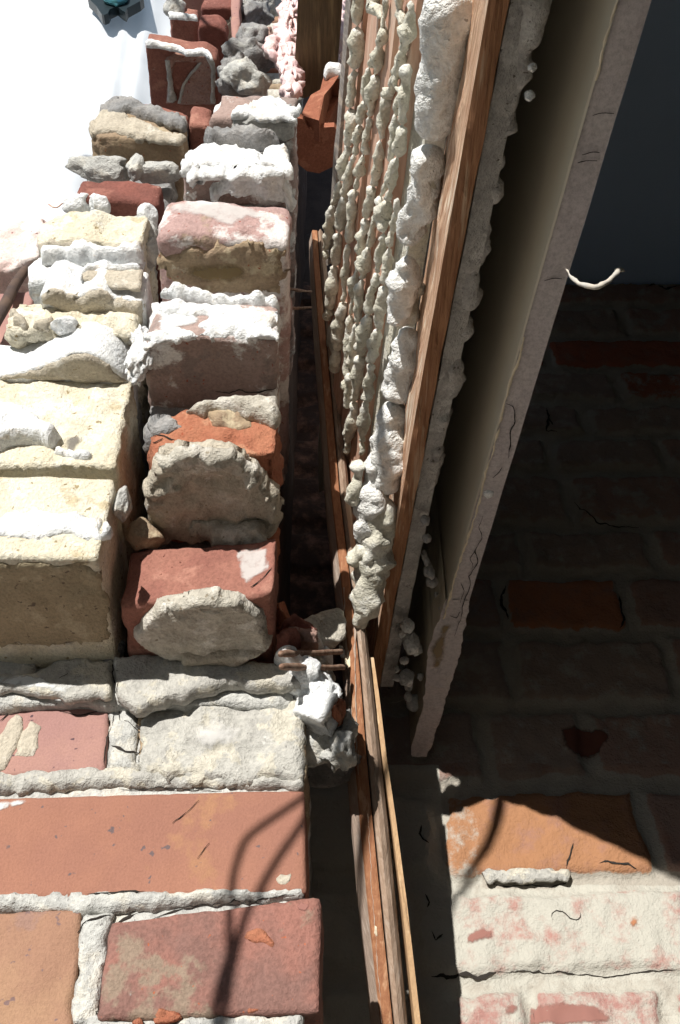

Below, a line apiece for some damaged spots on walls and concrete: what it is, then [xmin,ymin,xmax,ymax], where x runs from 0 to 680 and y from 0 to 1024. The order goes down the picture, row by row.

crack [493,403,515,478]
crack [451,517,483,636]
crack [121,786,220,821]
crack [486,844,581,920]
crack [600,860,637,869]
crack [431,968,680,980]